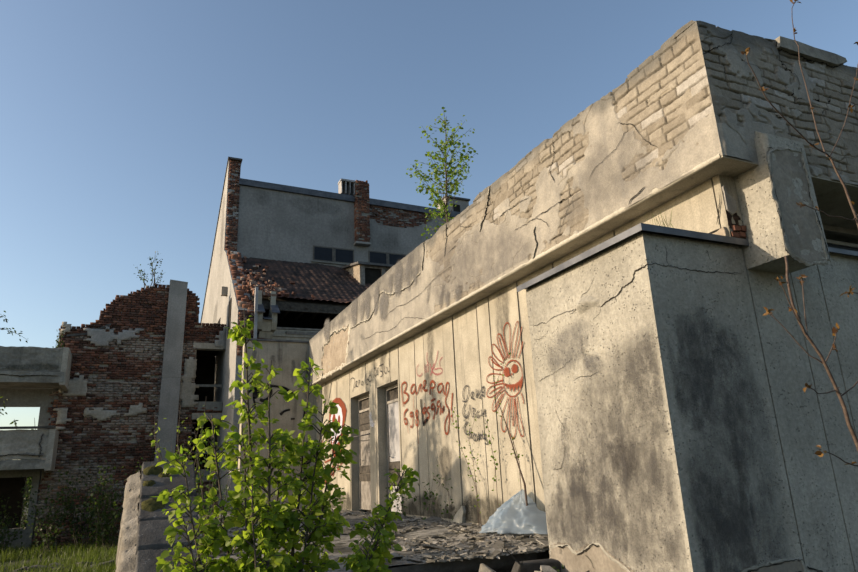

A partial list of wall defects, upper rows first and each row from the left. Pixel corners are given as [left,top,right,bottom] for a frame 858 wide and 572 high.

spalling [710,186,747,239]
crack [317,186,575,402]
crack [534,247,742,340]
peeling [317,324,350,380]